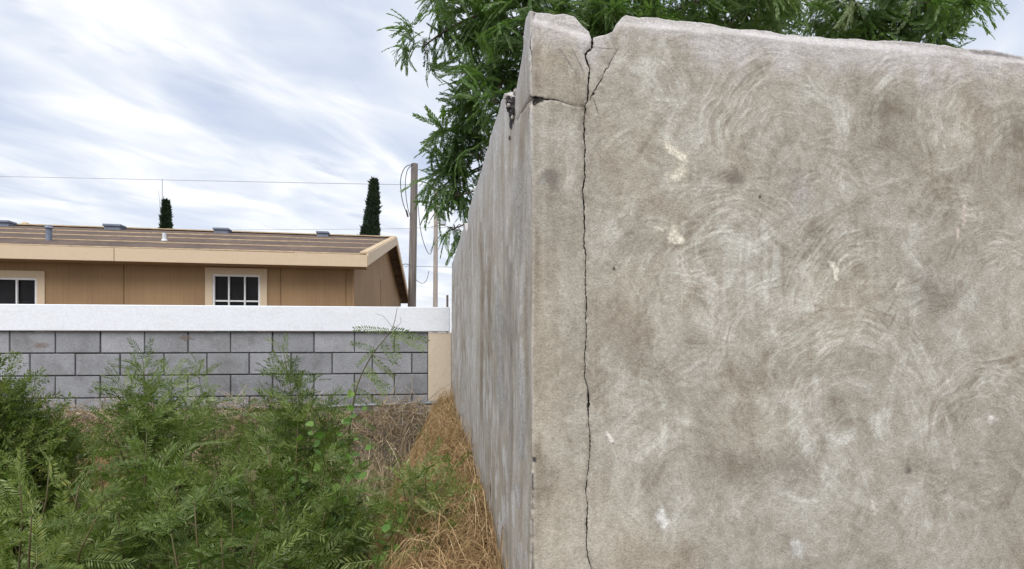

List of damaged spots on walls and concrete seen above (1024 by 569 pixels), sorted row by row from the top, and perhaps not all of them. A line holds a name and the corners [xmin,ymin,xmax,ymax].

crack [520,37,616,569]